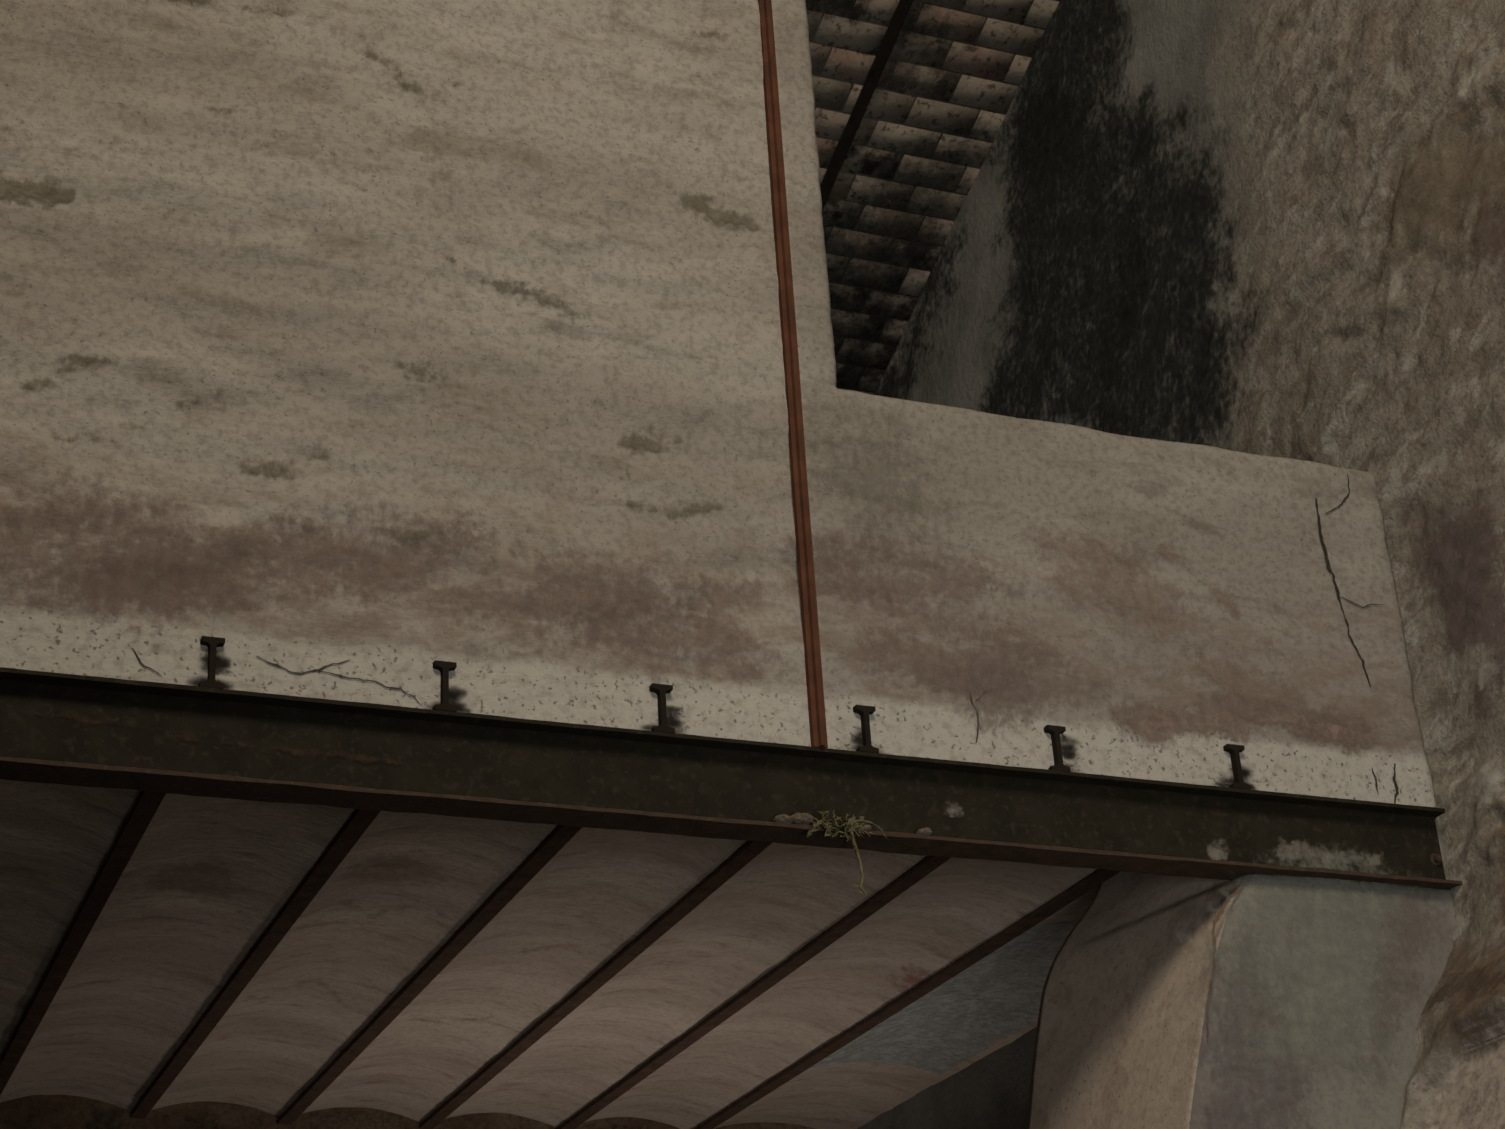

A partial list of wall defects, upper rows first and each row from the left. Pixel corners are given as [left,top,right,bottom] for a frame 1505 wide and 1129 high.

damp [825,0,1260,446]
damp [0,503,474,614]
crack [1315,474,1384,687]
damp [1111,654,1375,751]